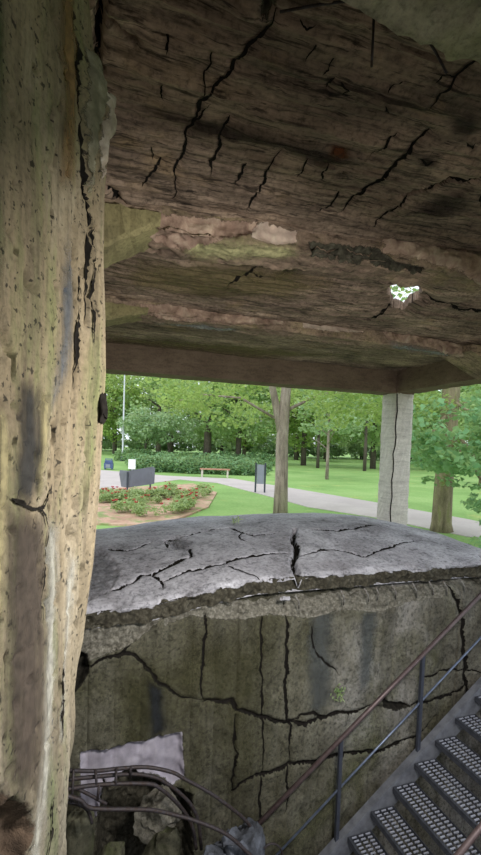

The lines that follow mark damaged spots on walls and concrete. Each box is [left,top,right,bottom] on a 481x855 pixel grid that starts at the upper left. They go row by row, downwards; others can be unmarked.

crack [300,19,355,96]
crack [142,8,276,199]
crack [72,0,120,383]
crack [235,149,282,208]
crack [297,60,481,227]
crack [229,266,263,284]
crack [371,303,390,318]
crack [426,293,481,313]
crack [61,394,481,818]
crack [47,801,55,855]